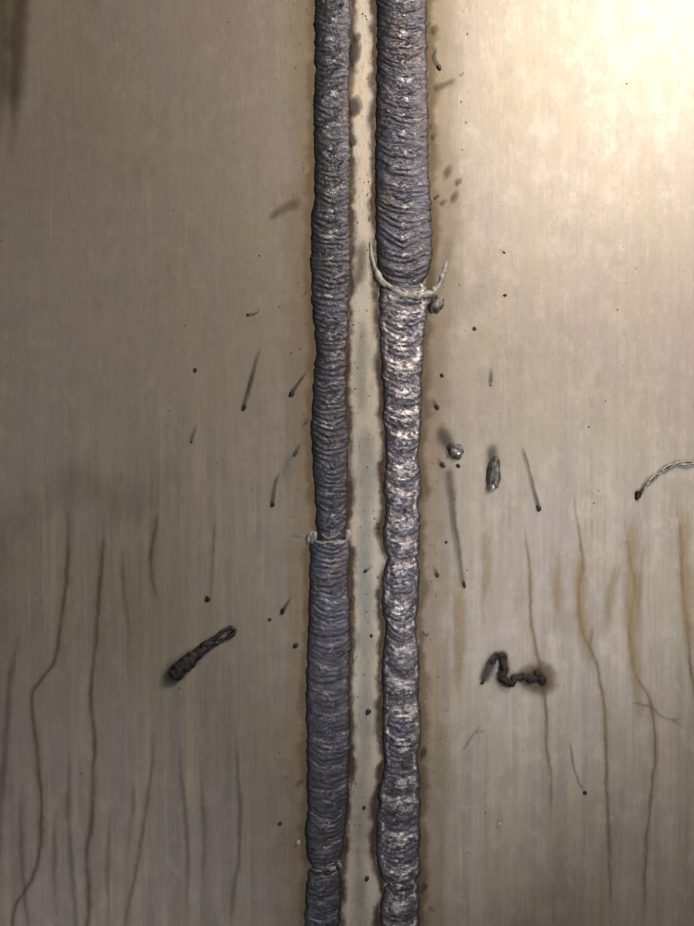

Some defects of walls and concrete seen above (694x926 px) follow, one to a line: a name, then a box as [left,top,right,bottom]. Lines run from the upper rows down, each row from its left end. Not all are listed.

damp [0,0,26,102]